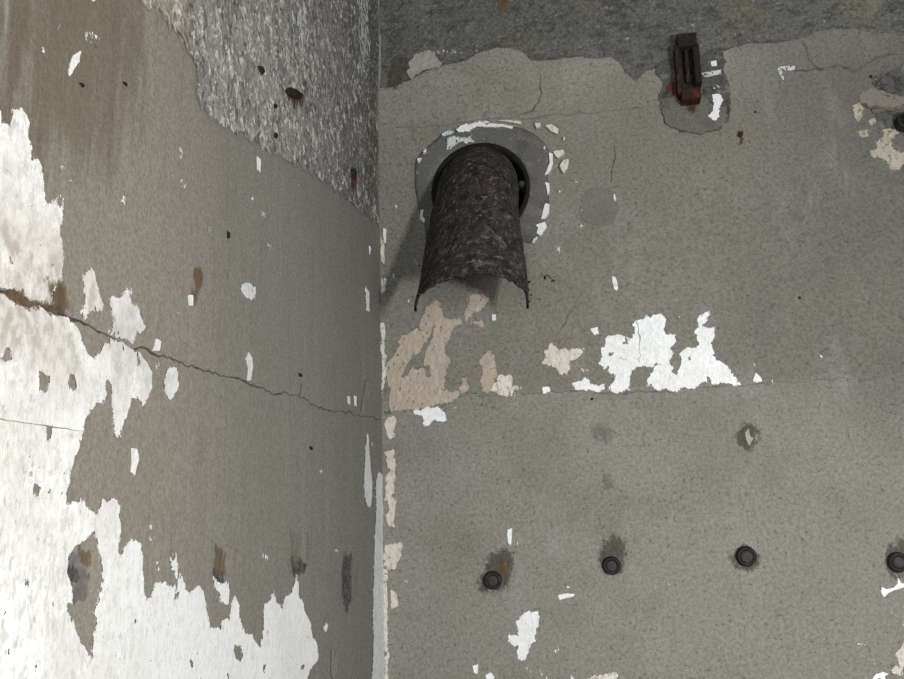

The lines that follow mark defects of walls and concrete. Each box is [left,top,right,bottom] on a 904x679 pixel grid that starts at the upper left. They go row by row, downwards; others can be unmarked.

peeling [68,51,81,76]
crack [793,41,900,73]
spalling [136,0,904,264]
crack [397,75,660,128]
crack [861,103,898,114]
crack [0,418,76,431]
peeling [0,107,319,679]
crack [0,290,898,420]
peeling [479,350,521,397]
peeling [542,311,741,394]
peeling [363,293,496,679]
peeling [508,611,547,679]